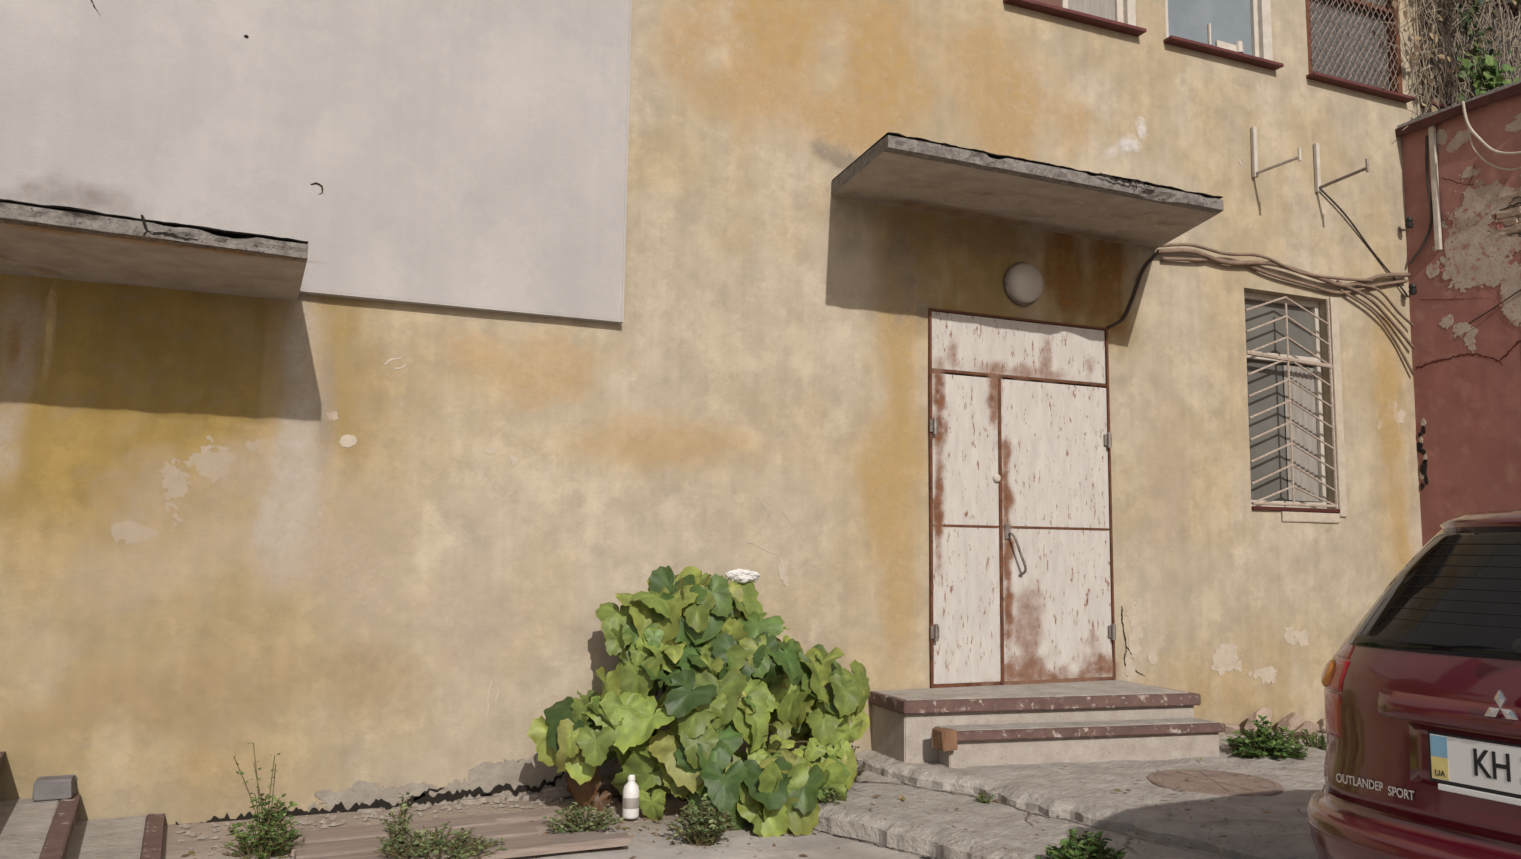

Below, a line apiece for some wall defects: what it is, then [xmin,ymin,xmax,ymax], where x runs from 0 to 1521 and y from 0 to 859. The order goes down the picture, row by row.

peeling [1426,166,1521,326]
peeling [1439,314,1479,353]
rust [988,358,1053,423]
water stain [252,293,326,582]
rust [933,371,948,559]
rust [1002,440,1113,684]
peeling [1211,643,1277,684]
peeling [1284,626,1309,647]
flaking render [308,753,568,813]